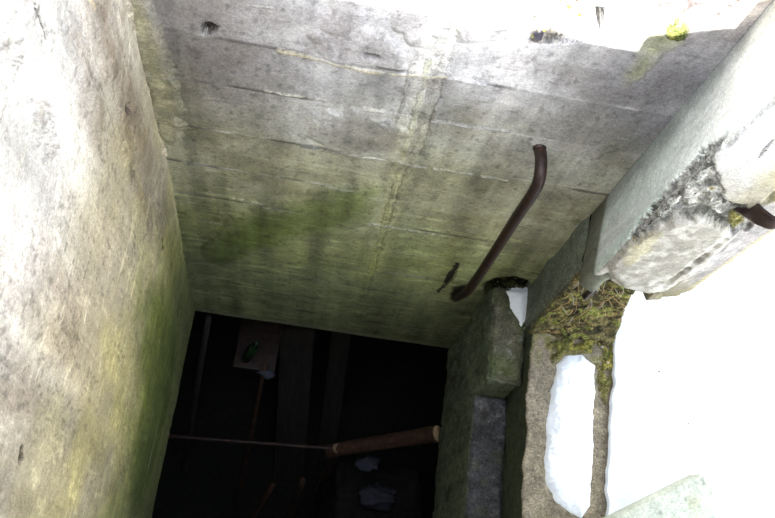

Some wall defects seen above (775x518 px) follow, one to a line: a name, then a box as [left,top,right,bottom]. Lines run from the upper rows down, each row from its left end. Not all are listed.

spalling [525,0,606,45]
spalling [651,0,741,41]
water stain [264,0,519,314]
spalling [624,131,754,247]